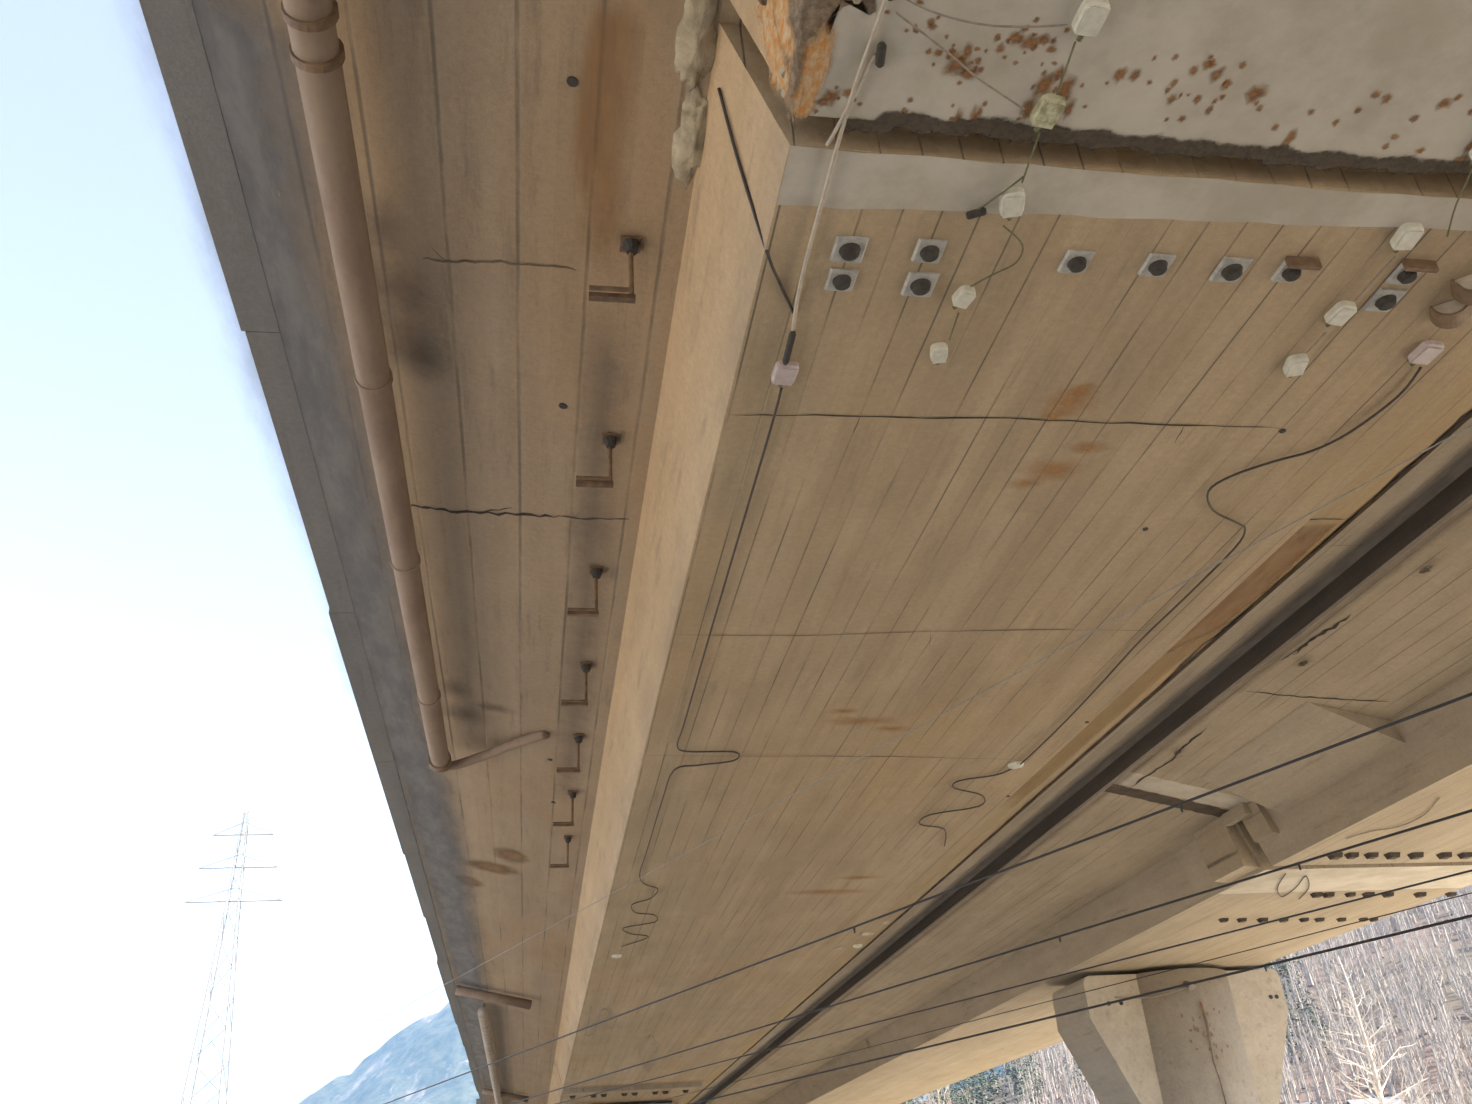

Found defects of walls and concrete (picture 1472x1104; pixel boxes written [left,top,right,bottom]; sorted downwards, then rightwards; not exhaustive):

spalling [757,0,876,128]
rust [814,86,862,114]
rust [905,0,1087,120]
rust [1105,54,1246,121]
rust [1247,88,1265,111]
rust [1272,125,1296,146]
rust [1333,92,1390,126]
crack [423,248,576,271]
crack [411,504,624,520]
crack [1310,410,1472,554]
crack [1161,605,1253,686]
crack [1199,1001,1227,1104]